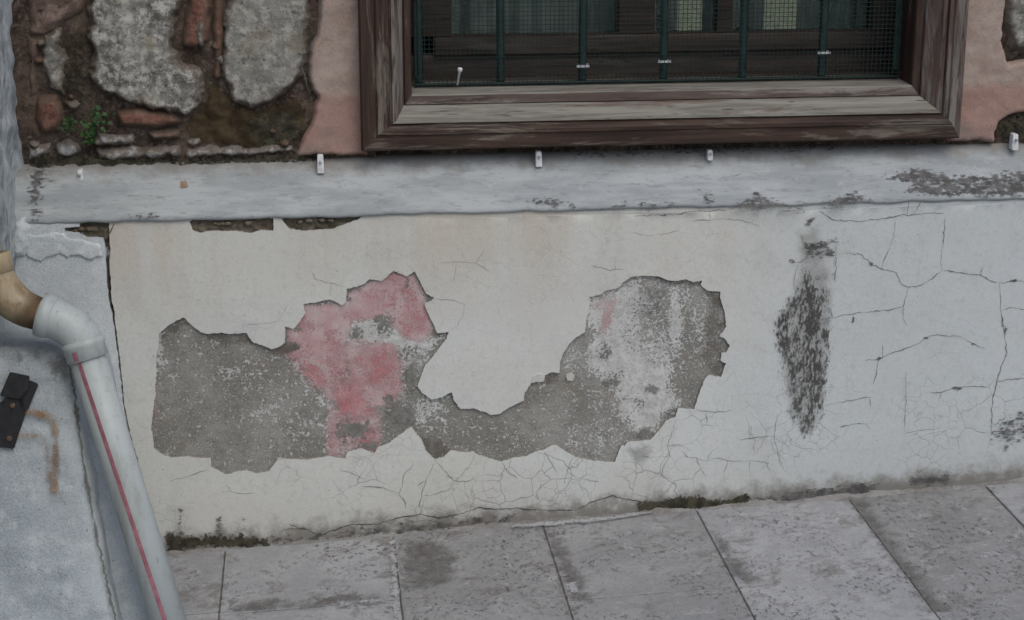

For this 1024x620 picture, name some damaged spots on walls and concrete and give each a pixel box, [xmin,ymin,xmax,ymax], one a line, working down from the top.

spalling [190,217,360,232]
water stain [731,192,838,438]
crack [820,204,1024,433]
peeling [151,271,729,473]
corrosion [26,411,59,493]
crack [282,452,644,537]
crack [644,420,786,474]